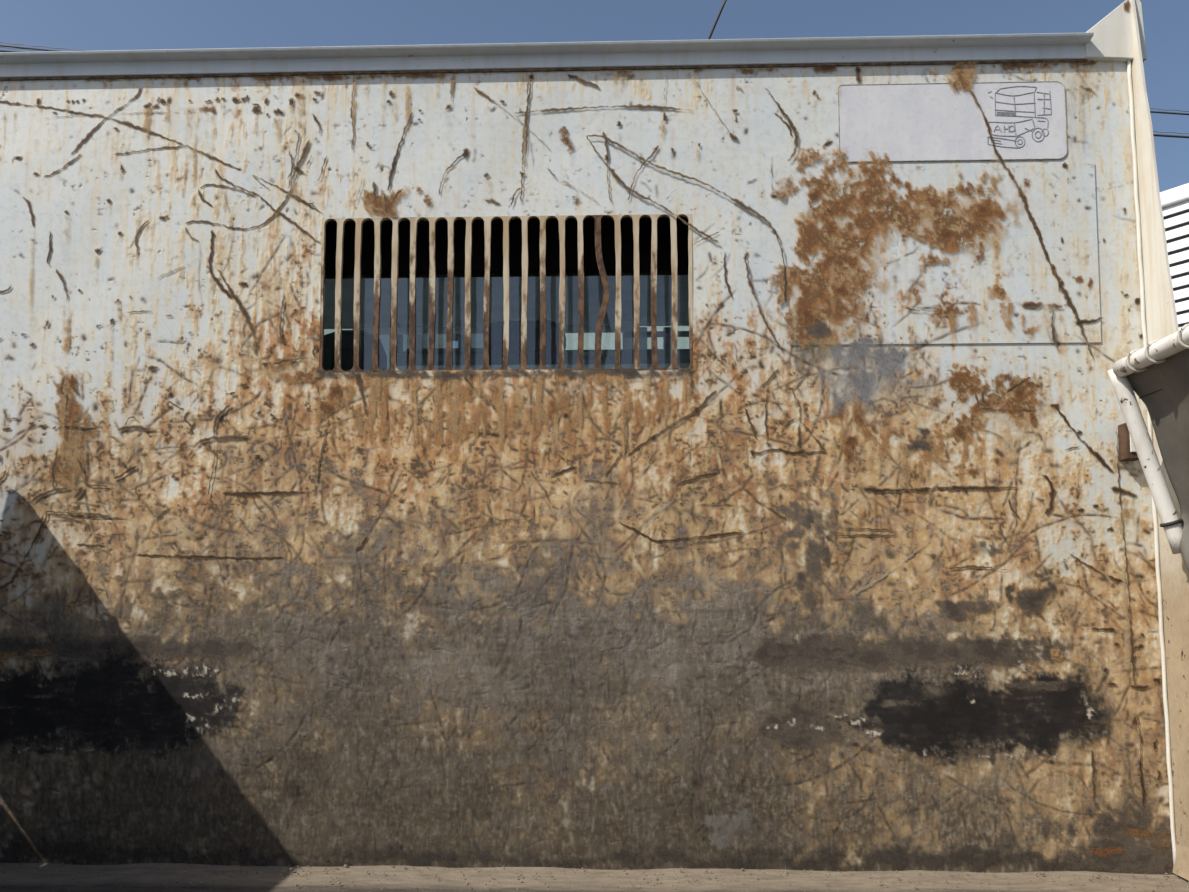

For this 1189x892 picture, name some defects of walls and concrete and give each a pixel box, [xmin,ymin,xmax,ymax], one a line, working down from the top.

rust [363,182,431,217]
rust [771,148,1016,349]
rust [901,284,1062,346]
rust [262,344,319,383]
rust [2,371,97,490]
rust [162,391,196,433]
rust [317,372,691,455]
rust [830,364,1055,482]